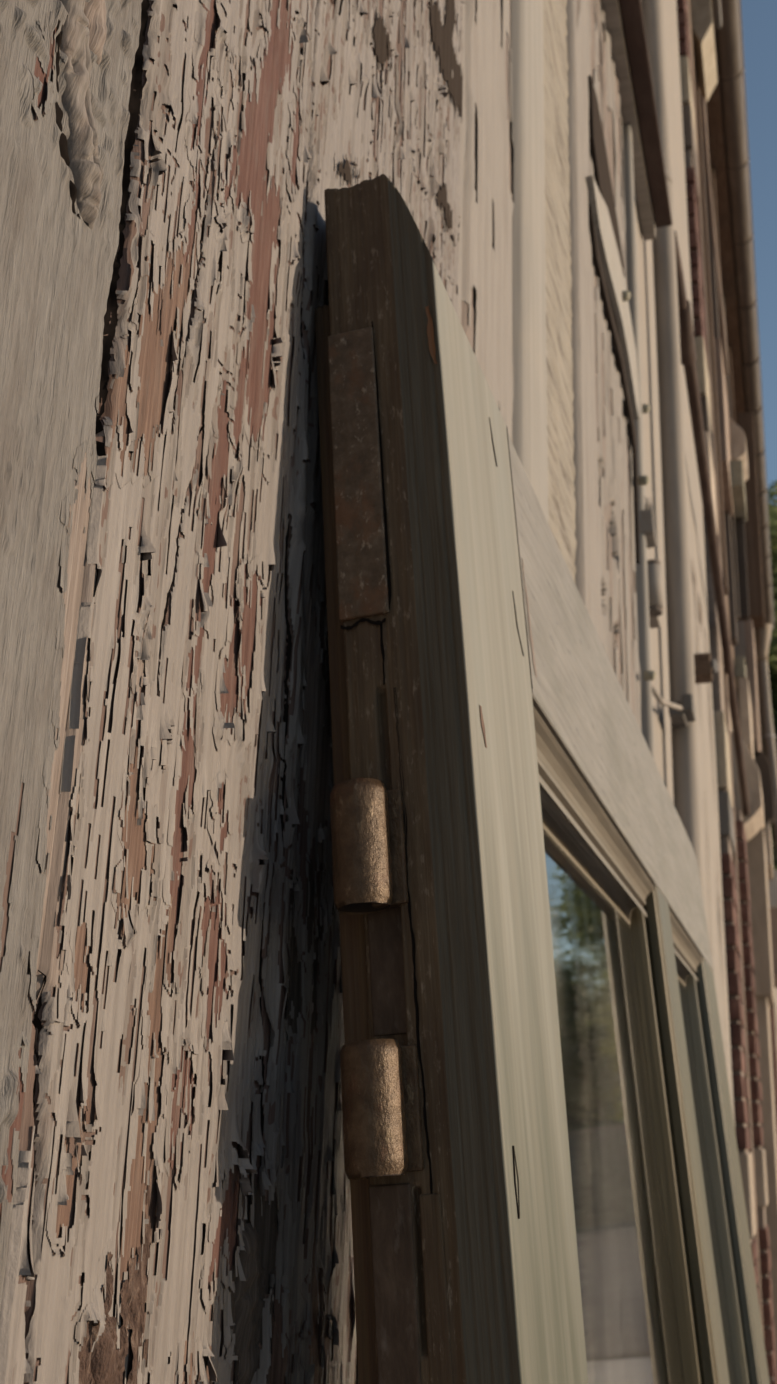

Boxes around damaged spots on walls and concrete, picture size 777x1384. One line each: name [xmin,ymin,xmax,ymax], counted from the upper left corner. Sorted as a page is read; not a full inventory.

peeling [26,0,304,1384]
peeling [299,591,334,873]
peeling [0,1031,35,1262]